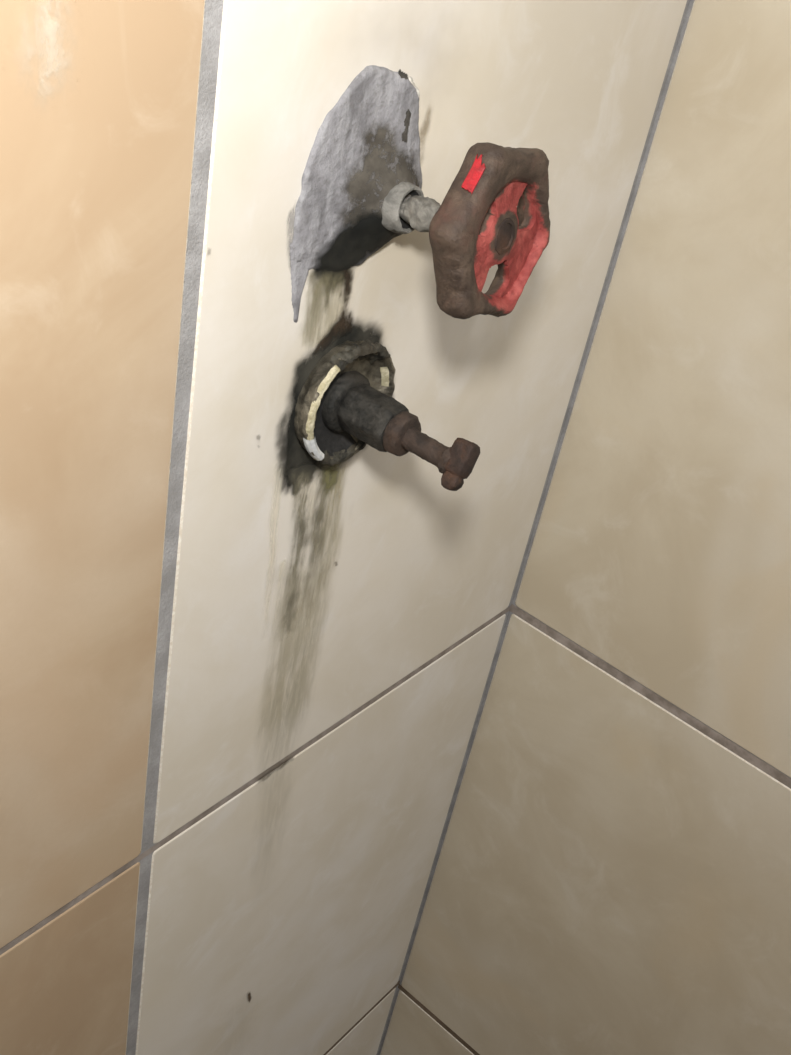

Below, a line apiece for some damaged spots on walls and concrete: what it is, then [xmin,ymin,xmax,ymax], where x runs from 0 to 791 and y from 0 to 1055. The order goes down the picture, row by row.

damp [271,324,382,578]